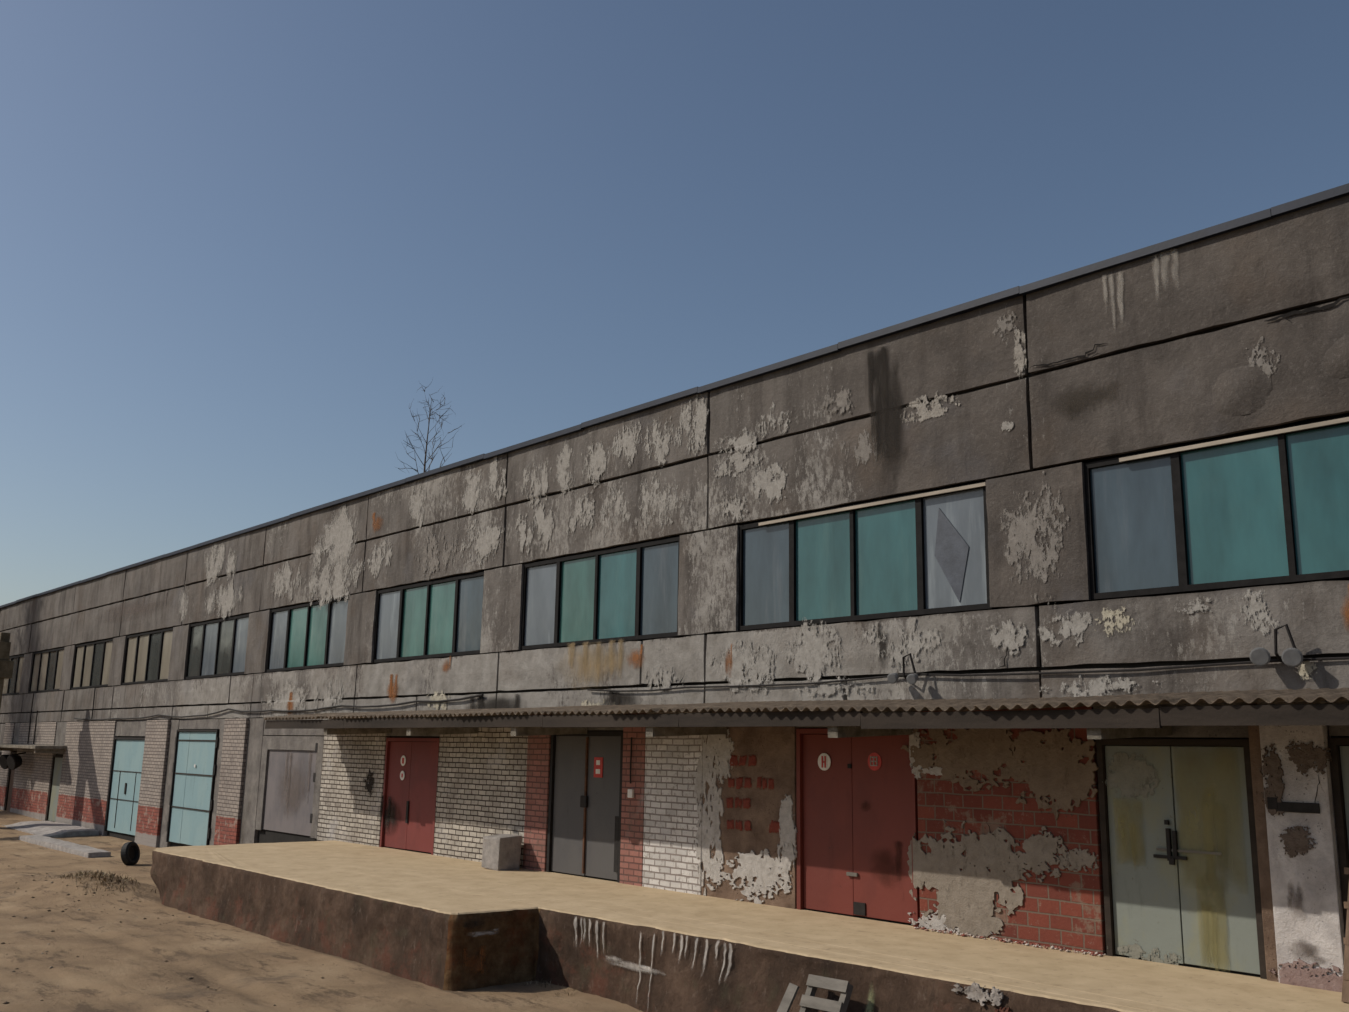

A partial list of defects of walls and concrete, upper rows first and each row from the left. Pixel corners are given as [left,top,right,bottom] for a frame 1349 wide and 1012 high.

water stain [868,347,901,461]
peeling [267,504,393,609]
peeling [986,471,1135,656]
peeling [694,729,797,904]
flaking render [901,728,1099,937]
flaking render [1259,741,1332,858]
water stain [574,917,732,995]
peeling [951,981,1011,1012]